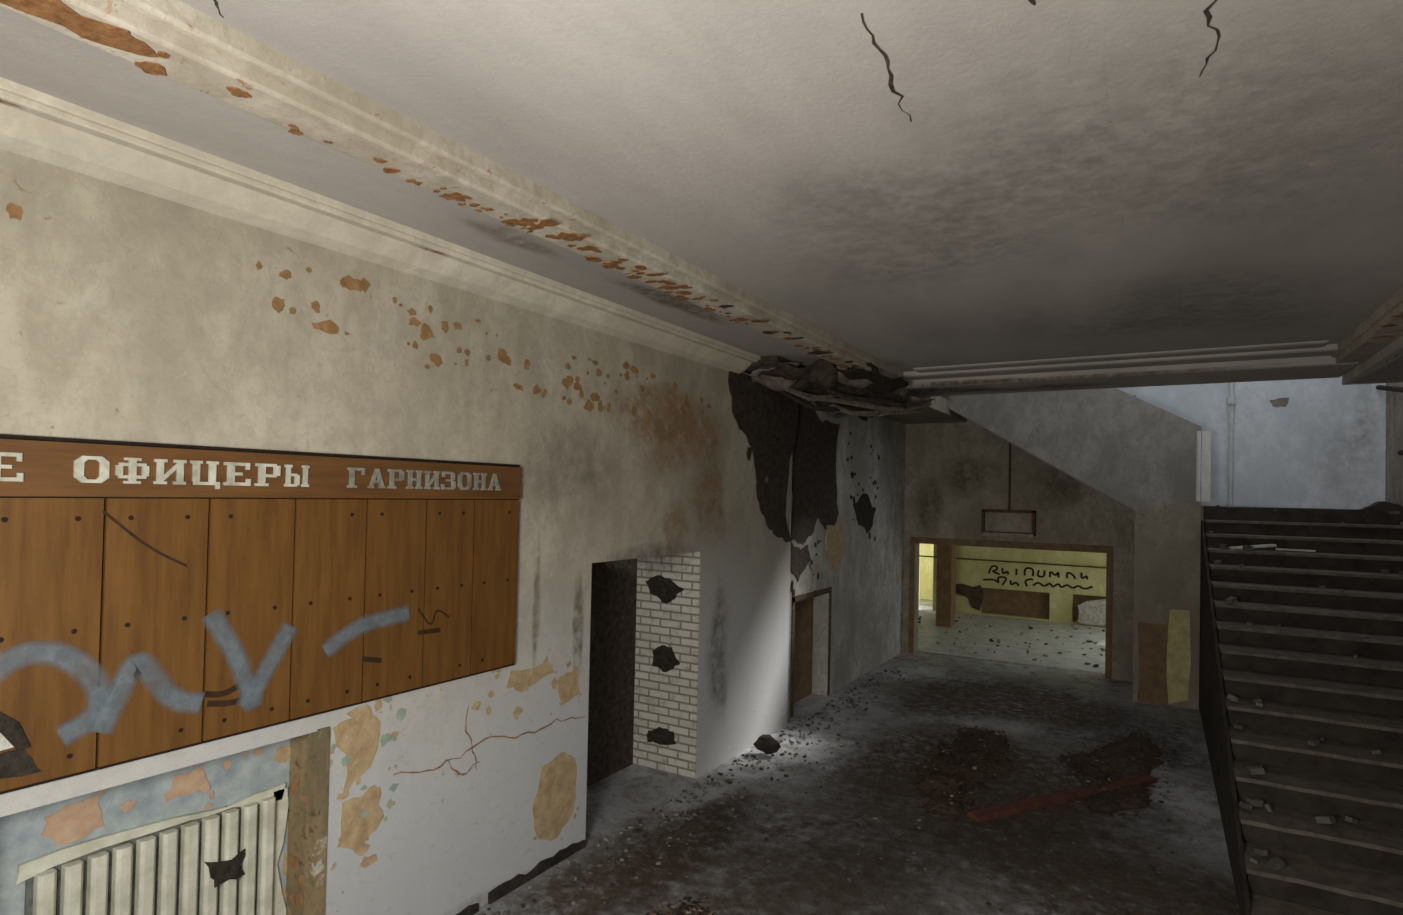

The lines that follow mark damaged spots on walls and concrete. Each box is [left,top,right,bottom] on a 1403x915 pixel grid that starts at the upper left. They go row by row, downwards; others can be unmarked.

crack [861,13,912,122]
crack [1199,0,1221,77]
peeling [272,297,349,335]
peeling [340,275,370,293]
peeling [392,297,711,420]
spalling [728,371,880,596]
spalling [645,575,684,604]
peeling [471,652,582,720]
peeling [41,788,107,845]
peeling [164,763,214,810]
peeling [329,696,406,870]
peeling [532,752,579,841]